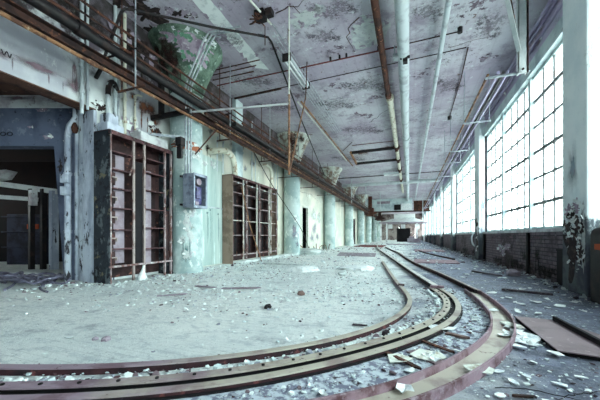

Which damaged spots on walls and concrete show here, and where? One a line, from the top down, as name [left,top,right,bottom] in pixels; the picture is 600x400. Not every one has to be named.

flaking render [108,0,293,77]
rust [131,93,159,137]
peeling [562,197,585,283]